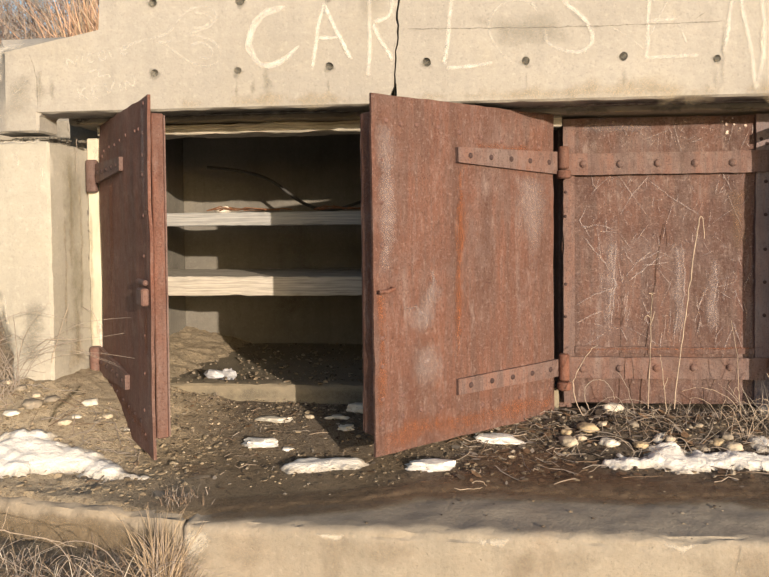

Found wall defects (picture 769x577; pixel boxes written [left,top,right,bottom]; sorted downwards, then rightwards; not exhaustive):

crack [394,0,471,96]